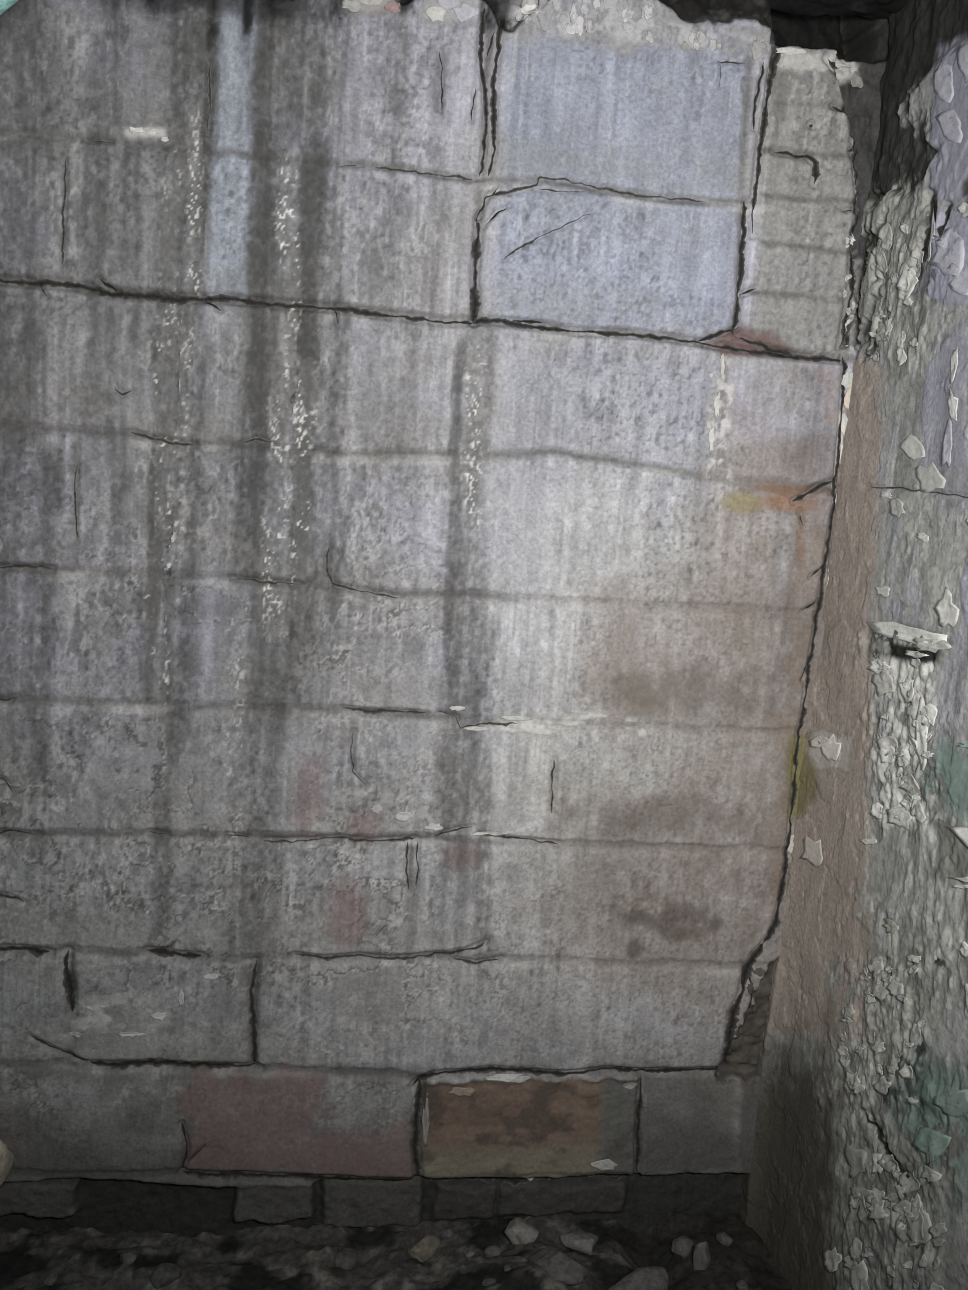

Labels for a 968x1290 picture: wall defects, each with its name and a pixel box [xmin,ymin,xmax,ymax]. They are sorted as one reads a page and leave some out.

leakage [145,491,193,684]
leakage [152,65,208,473]
leakage [246,49,326,629]
crack [340,8,503,180]
crack [0,46,859,1187]
leakage [454,351,485,525]
leakage [788,736,815,814]
peeling [804,729,852,772]
peeling [831,372,853,504]
peeling [827,38,968,374]
peeling [866,347,968,889]
peeling [823,890,968,1290]